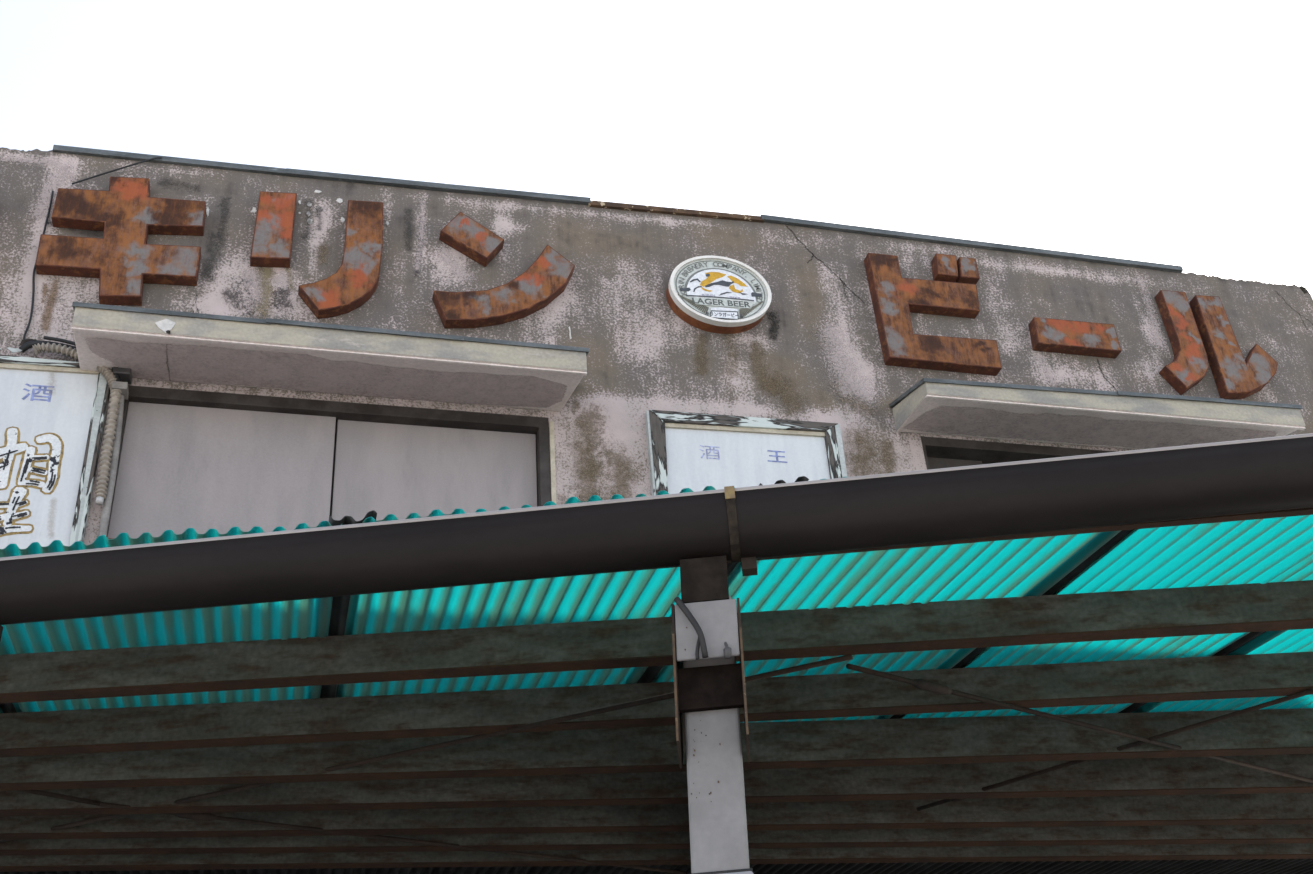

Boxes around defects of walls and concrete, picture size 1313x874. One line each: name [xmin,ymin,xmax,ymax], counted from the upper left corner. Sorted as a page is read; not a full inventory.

damp [2,154,69,229]
corrosion [42,280,59,330]
damp [87,338,634,504]